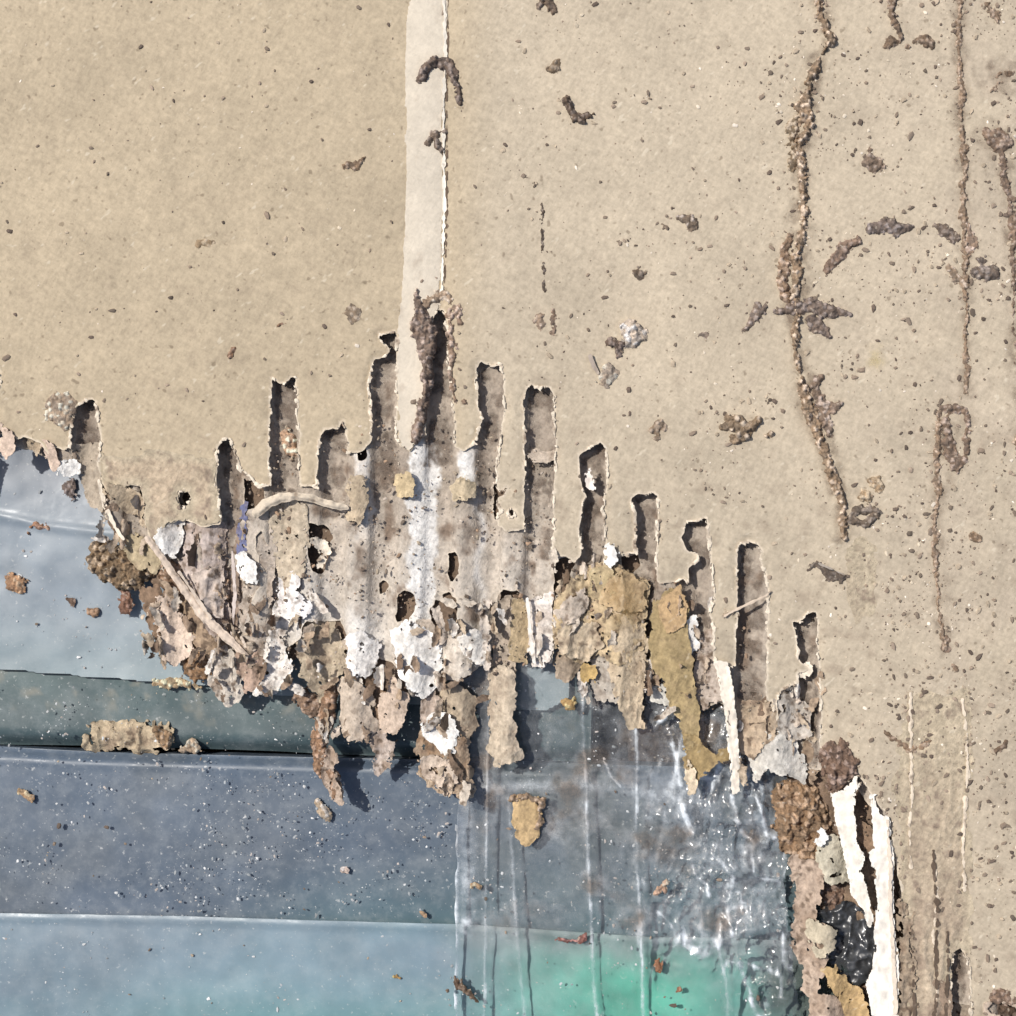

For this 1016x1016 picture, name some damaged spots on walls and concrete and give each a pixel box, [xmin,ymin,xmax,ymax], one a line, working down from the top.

peeling [532,308,560,336]
spalling [0,422,676,806]
peeling [818,536,878,624]
peeling [508,792,546,847]
peeling [667,591,975,1016]
spalling [997,1003,1016,1016]